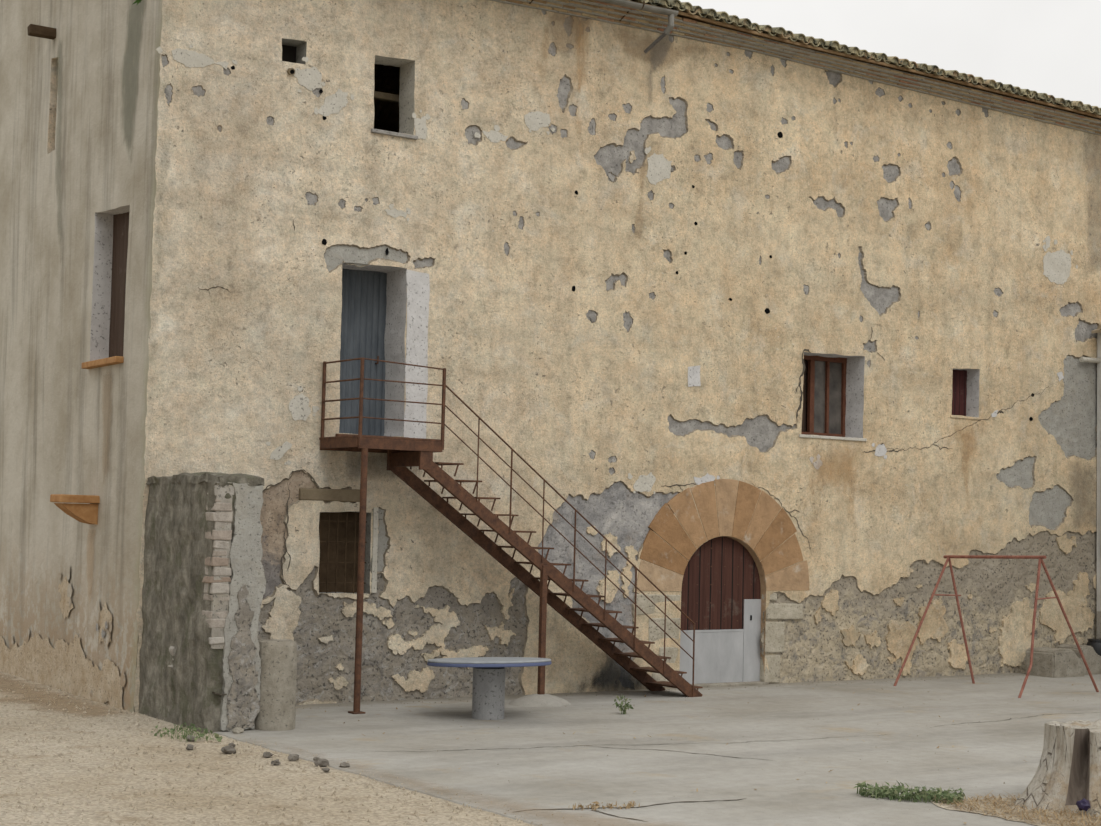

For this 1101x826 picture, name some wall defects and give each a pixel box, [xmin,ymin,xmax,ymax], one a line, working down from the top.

flaking render [557,75,577,116]
flaking render [594,77,686,182]
flaking render [322,239,433,271]
flaking render [858,247,899,315]
flaking render [1059,303,1098,342]
flaking render [667,415,795,452]
crack [795,349,811,418]
crack [864,382,1057,453]
flaking render [1029,355,1097,460]
flaking render [226,471,528,729]
flaking render [538,456,678,660]
flaking render [745,457,1097,697]